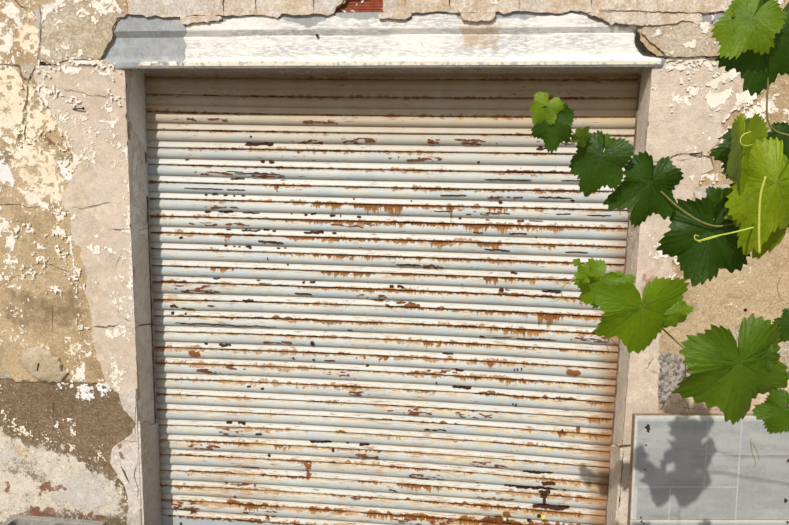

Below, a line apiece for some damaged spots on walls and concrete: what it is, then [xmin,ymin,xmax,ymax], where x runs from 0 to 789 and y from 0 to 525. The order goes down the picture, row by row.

spalling [335,0,383,13]
crack [591,0,726,14]
crack [1,0,97,147]
spalling [587,9,789,161]
corrosion [213,135,274,150]
corrosion [292,137,375,153]
peeling [689,163,724,189]
peeling [0,0,162,525]
corrosion [160,159,621,431]
corrosion [168,421,312,525]
corrosion [336,430,380,460]
corrosion [330,459,589,525]